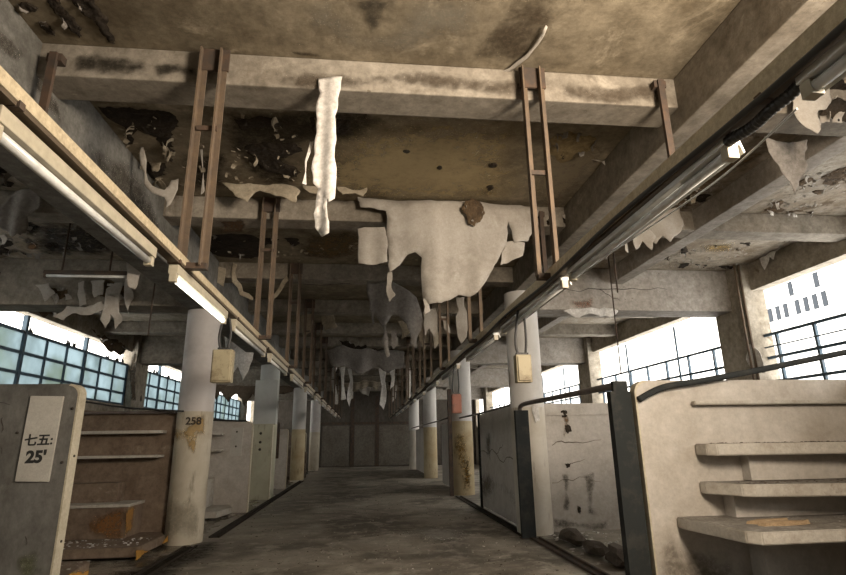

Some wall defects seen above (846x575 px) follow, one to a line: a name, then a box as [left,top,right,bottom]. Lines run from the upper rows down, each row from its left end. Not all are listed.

spalling [38,0,115,44]
water stain [79,56,143,72]
water stain [158,64,193,73]
water stain [292,76,322,87]
water stain [407,76,519,91]
water stain [567,86,658,102]
peeling [793,76,846,134]
spalling [98,106,187,208]
peeling [751,136,846,217]
peeling [210,76,550,410]
peeling [625,182,724,253]
peeling [36,263,141,355]